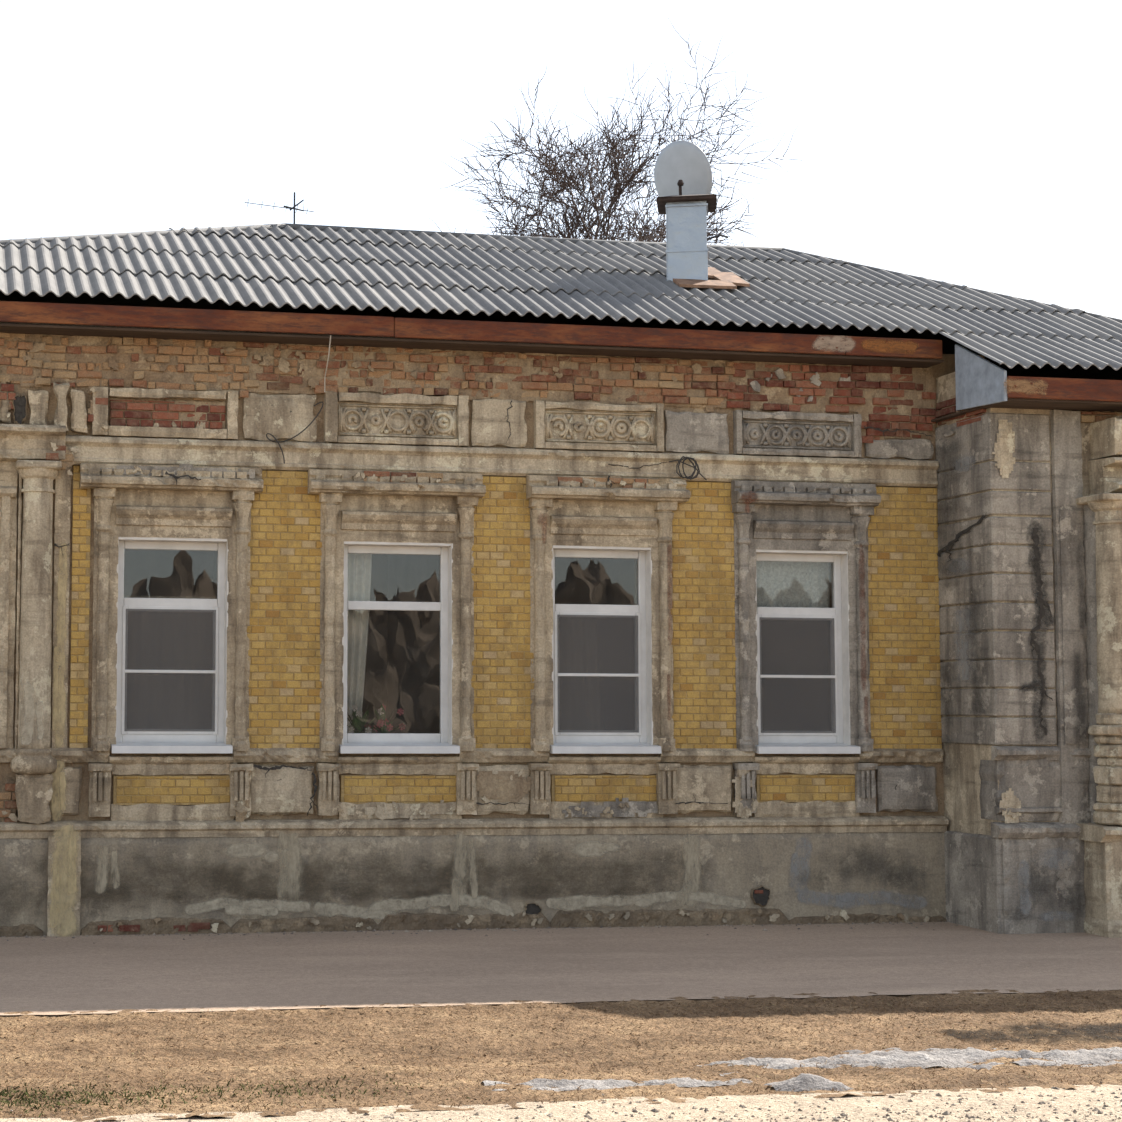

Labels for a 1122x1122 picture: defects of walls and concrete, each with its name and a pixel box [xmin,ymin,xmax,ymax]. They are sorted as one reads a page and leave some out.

spalling [0,332,986,443]
spalling [1080,411,1122,423]
spalling [992,420,1015,478]
crack [937,516,986,562]